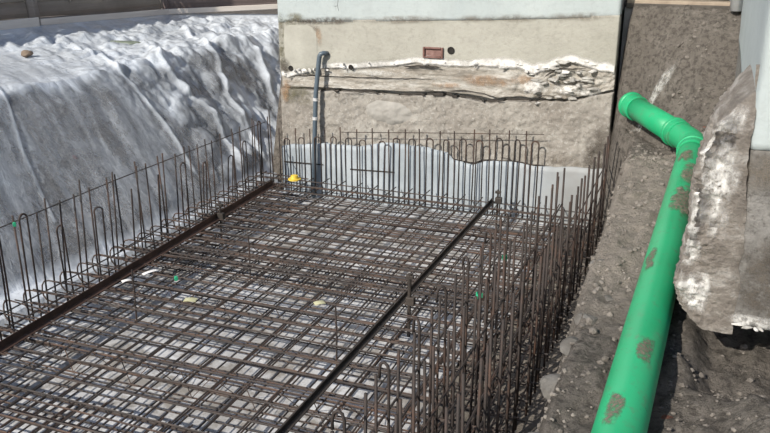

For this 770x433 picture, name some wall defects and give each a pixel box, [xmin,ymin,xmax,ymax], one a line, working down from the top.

crack [285,65,587,102]
spalling [281,47,615,105]